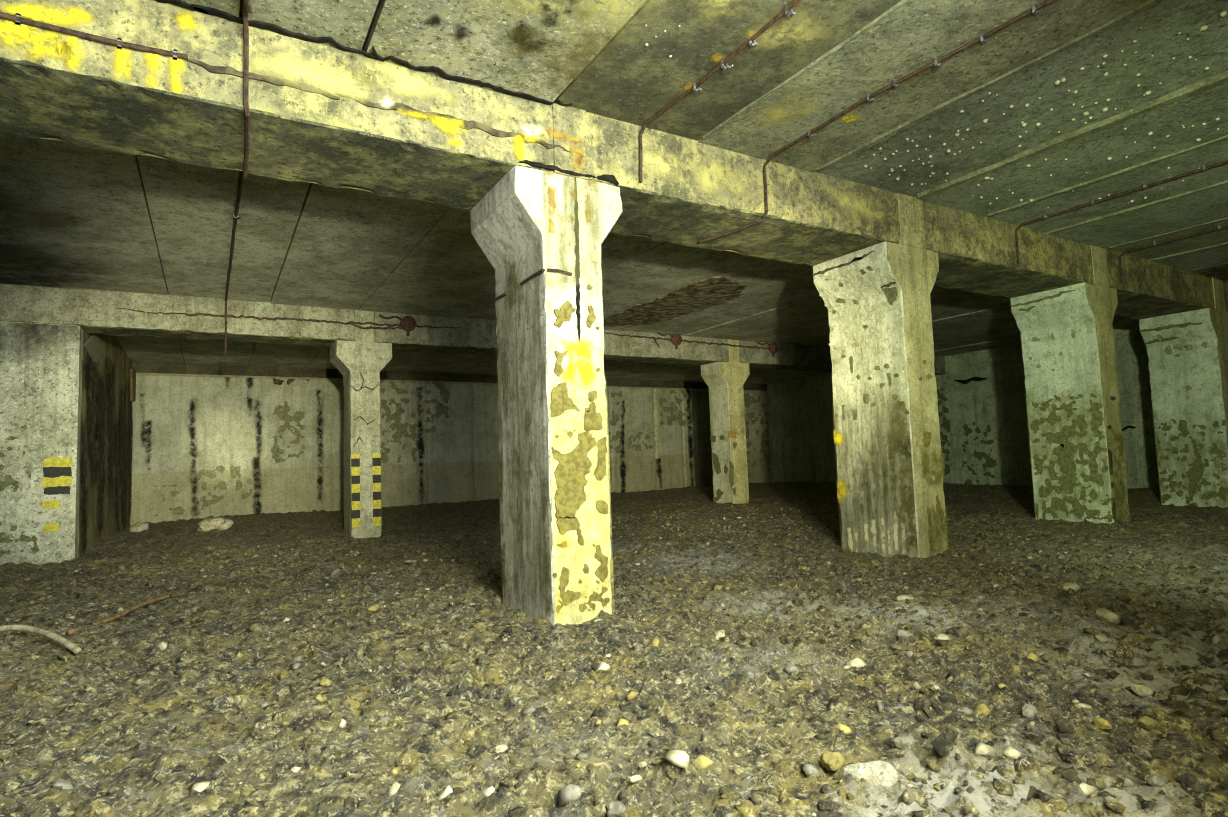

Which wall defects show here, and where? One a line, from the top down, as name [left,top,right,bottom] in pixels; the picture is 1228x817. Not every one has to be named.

damp [254,54,452,107]
crack [156,0,572,107]
damp [456,25,467,39]
damp [509,0,641,86]
damp [522,126,541,136]
crack [182,58,784,350]
crack [117,308,461,330]
spalling [554,276,747,330]
peeling [1157,334,1207,357]
peeling [550,350,687,613]
peeling [1030,393,1116,523]
peeling [1156,419,1228,507]